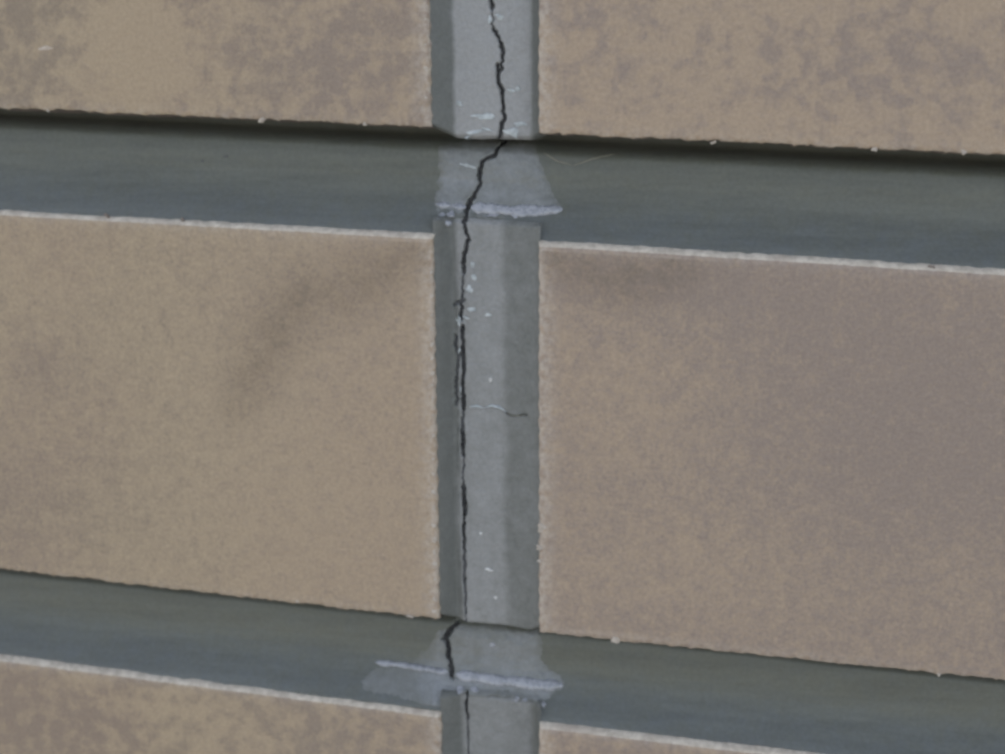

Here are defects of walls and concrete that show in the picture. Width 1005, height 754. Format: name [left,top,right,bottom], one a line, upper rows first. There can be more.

crack [442,0,527,754]